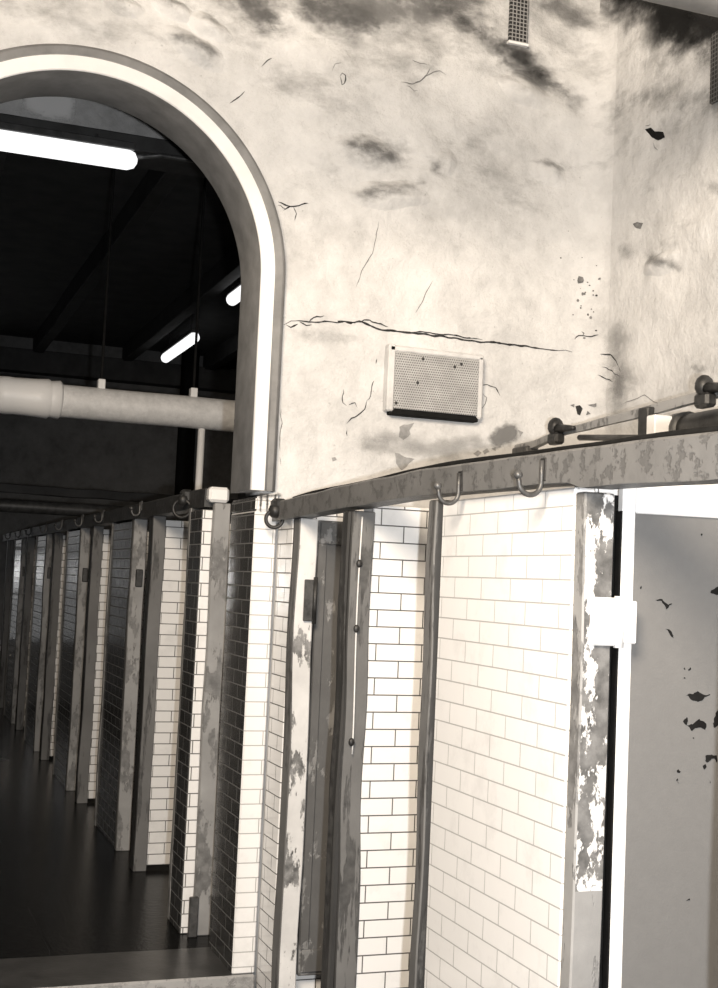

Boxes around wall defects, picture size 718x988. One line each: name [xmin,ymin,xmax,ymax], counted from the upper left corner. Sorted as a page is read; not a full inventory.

water stain [658,13,698,49]
crack [284,284,620,381]
peeling [688,691,710,702]
peeling [683,711,718,739]